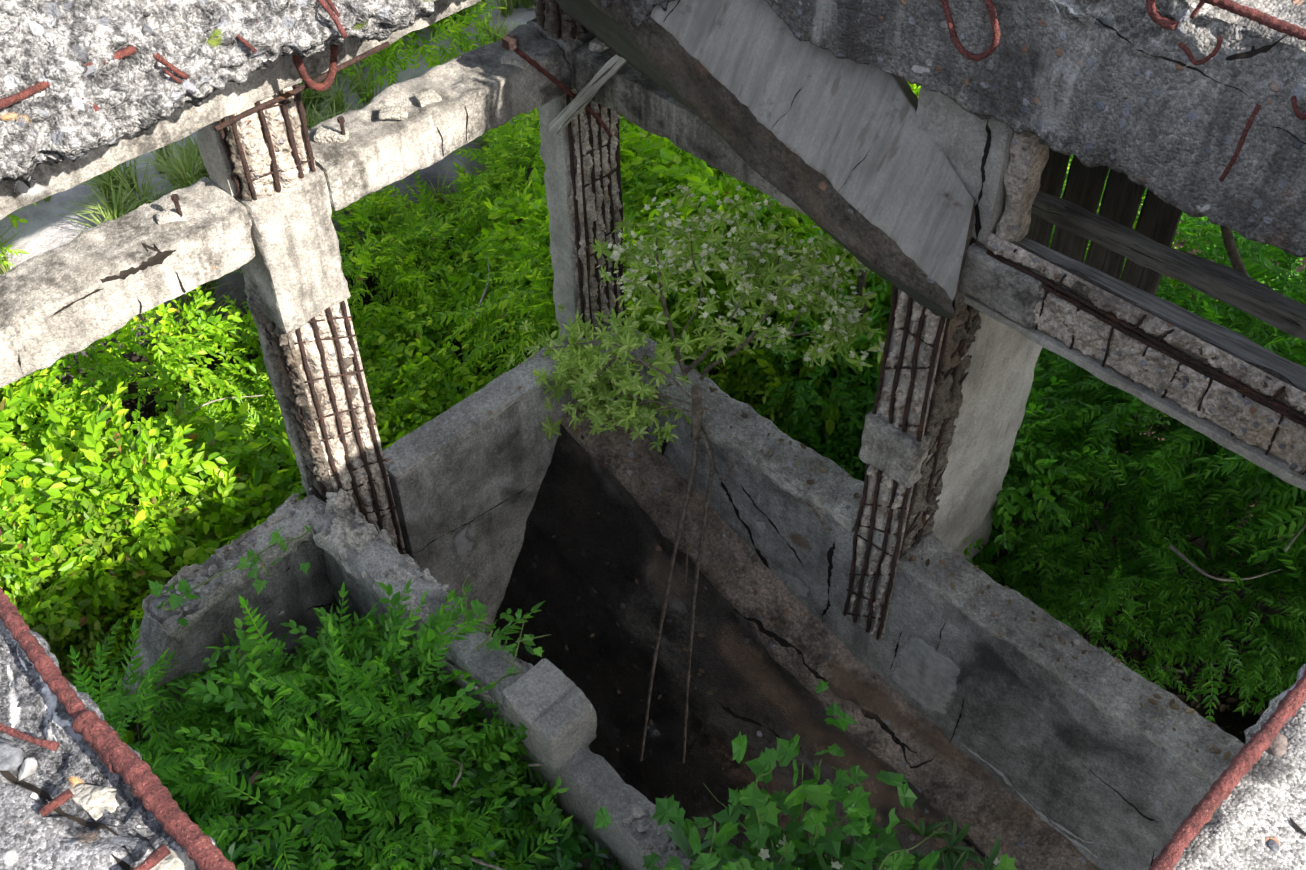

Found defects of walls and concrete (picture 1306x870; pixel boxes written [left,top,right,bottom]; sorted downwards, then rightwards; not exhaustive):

crack [53,242,187,322]
spalling [217,83,350,202]
spalling [260,299,406,555]
spalling [562,89,626,338]
spalling [843,285,981,641]
spalling [985,233,1306,475]
crack [714,465,835,623]
crack [715,700,803,753]
crack [734,609,965,768]
peeling [890,636,960,715]
crack [934,816,993,866]
crack [1085,766,1159,866]